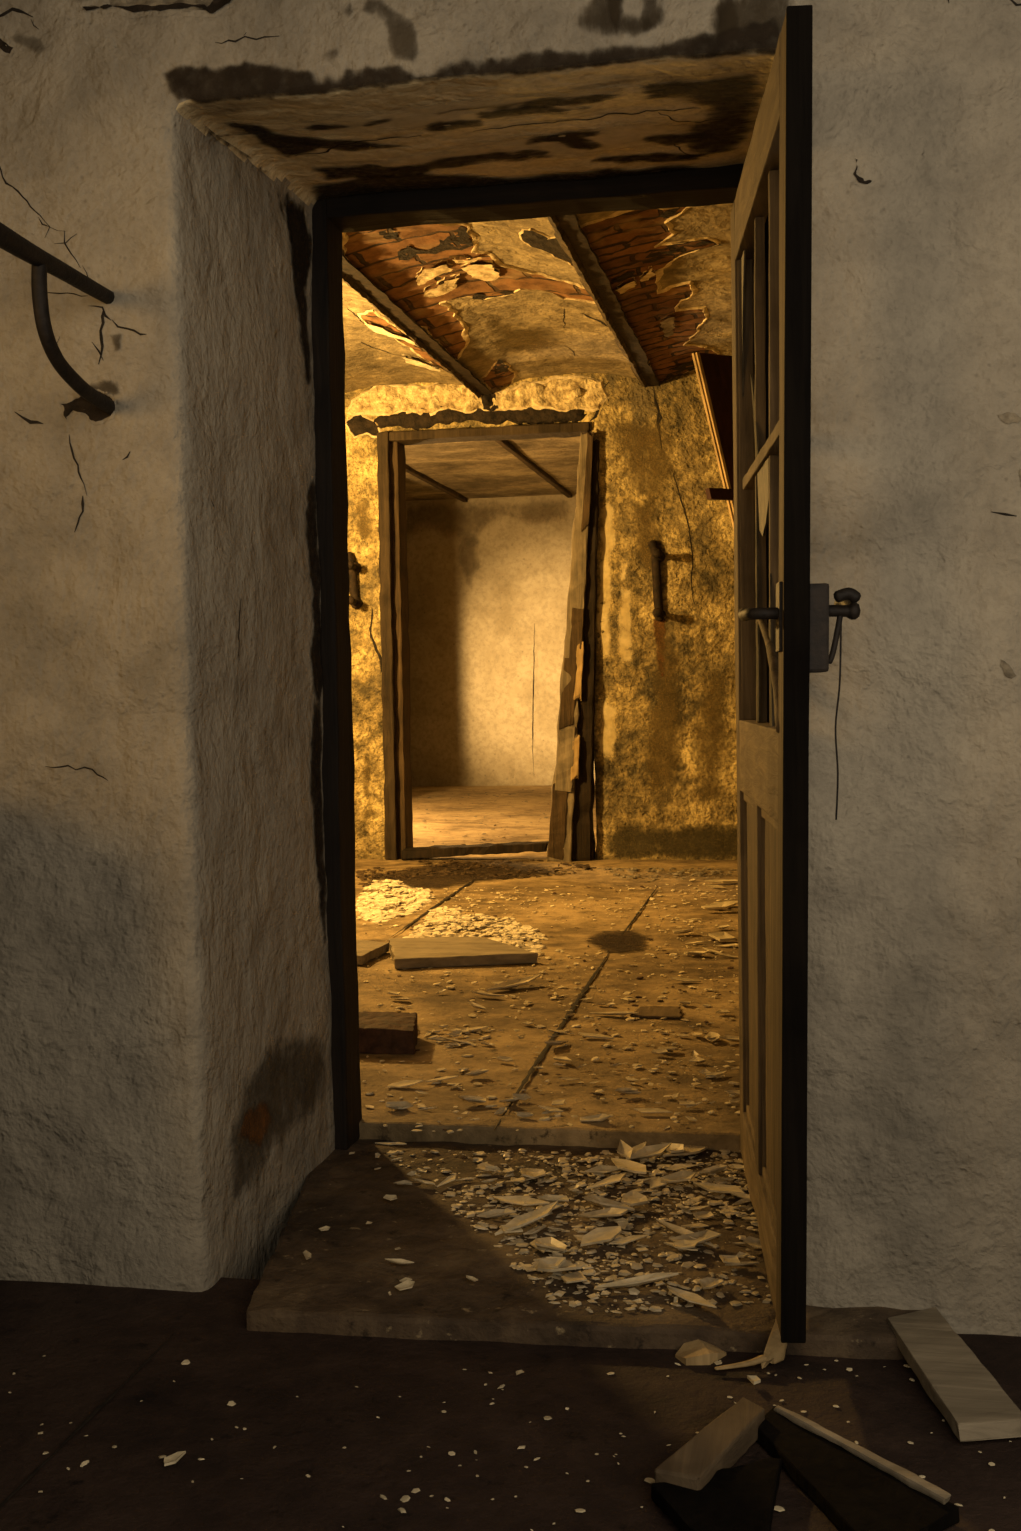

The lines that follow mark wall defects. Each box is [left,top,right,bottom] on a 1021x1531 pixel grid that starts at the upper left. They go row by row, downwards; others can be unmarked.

crack [0,7,38,29]
flaking render [81,0,235,19]
leakage [166,0,787,103]
crack [0,167,146,364]
flaking render [342,223,610,438]
leakage [210,75,760,382]
flaking render [580,207,722,381]
crack [45,765,108,781]
leakage [588,930,649,952]
leakage [233,1042,323,1193]